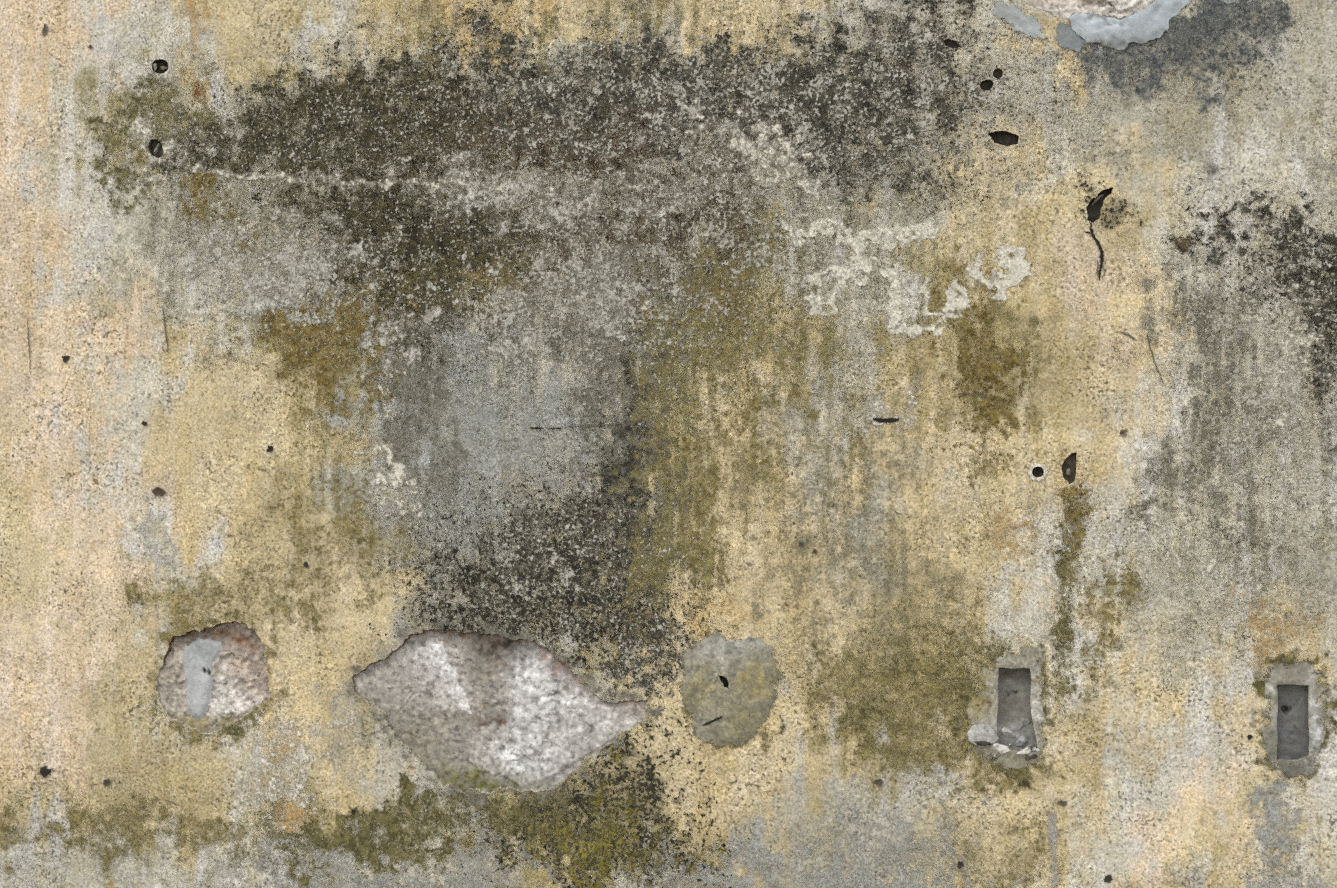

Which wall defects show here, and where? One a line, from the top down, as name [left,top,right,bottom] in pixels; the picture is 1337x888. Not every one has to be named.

spalling [1021,0,1154,19]
crack [1084,223,1106,280]
leakage [838,409,867,471]
leakage [861,380,923,435]
leakage [952,245,1047,488]
leakage [1112,153,1337,631]
leakage [1026,482,1077,644]
spalling [156,621,271,734]
leakage [240,683,354,819]
spalling [352,629,648,794]
leakage [254,825,436,888]
leakage [801,803,981,888]